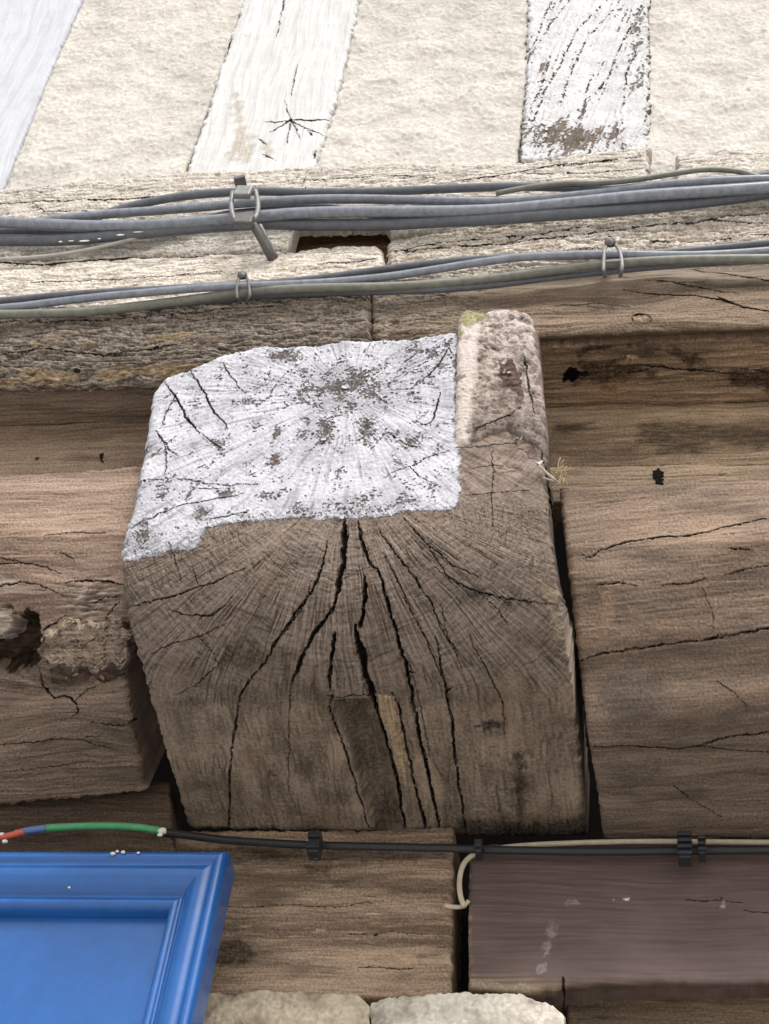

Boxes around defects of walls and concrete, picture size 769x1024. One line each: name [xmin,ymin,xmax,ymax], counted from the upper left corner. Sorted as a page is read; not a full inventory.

crack [258,64,646,182]
spalling [0,361,198,388]
crack [134,372,258,526]
peeling [300,365,390,408]
peeling [356,414,433,443]
crack [385,346,558,535]
spalling [0,607,127,686]
crack [0,670,138,773]
crack [0,532,245,694]
crack [228,518,546,830]
crack [580,518,769,660]
crack [594,731,769,752]